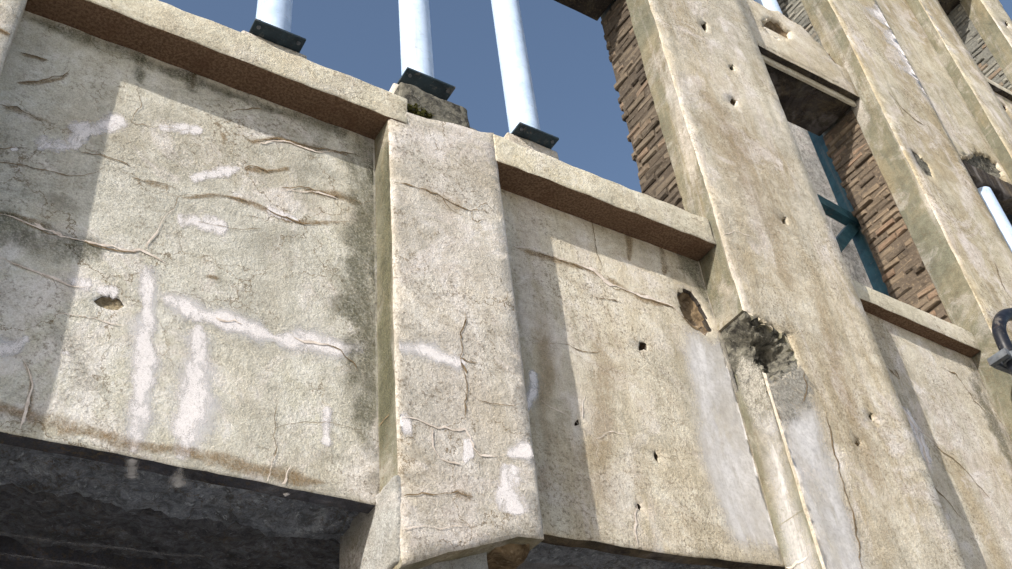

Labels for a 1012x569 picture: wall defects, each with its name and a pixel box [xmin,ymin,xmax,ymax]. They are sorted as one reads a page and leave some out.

efflorescence [36,114,127,153]
crack [130,93,203,135]
water stain [136,58,247,102]
spalling [961,154,1001,178]
spalling [94,285,123,310]
crack [0,137,374,325]
water stain [127,138,466,478]
crack [513,222,684,317]
crack [400,312,517,464]
spalling [677,292,814,434]
crack [404,491,473,499]
crack [825,409,862,566]